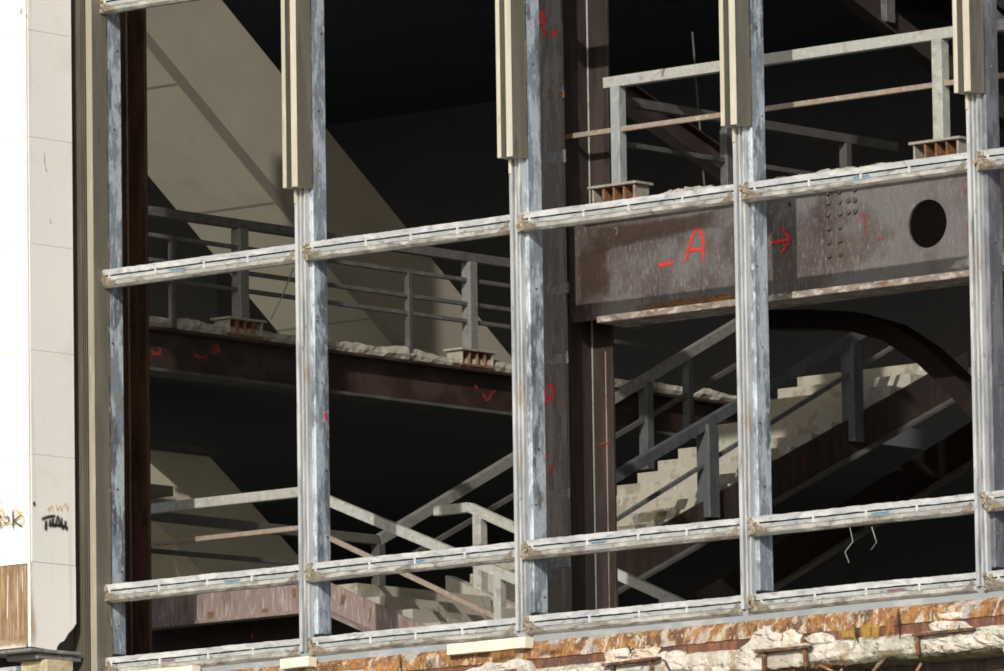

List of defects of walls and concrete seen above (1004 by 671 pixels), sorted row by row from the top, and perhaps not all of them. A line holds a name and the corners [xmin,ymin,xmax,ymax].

spalling [466,658,536,671]
corrosion [231,597,1004,671]
spalling [558,611,1004,671]